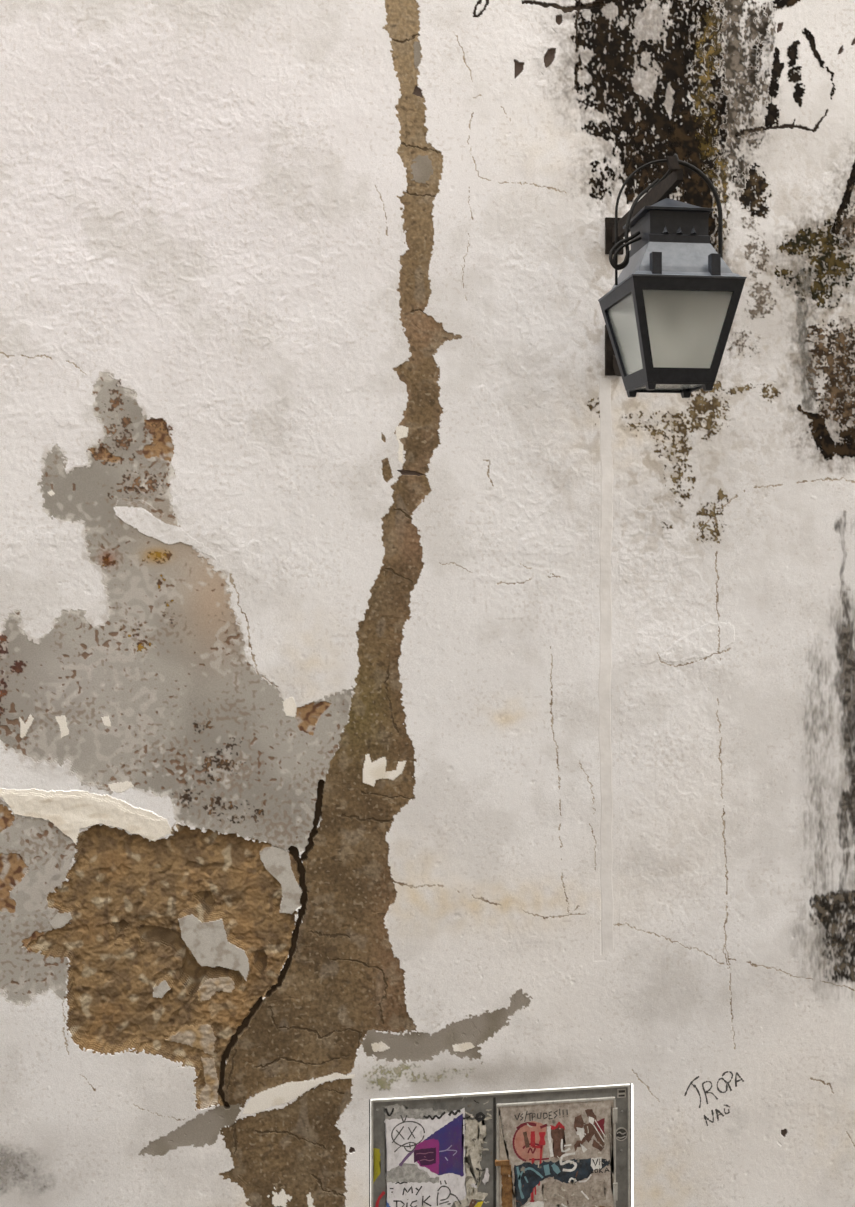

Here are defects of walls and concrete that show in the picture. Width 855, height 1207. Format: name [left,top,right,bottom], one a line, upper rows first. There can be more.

damp [571,0,836,357]
damp [831,163,855,247]
damp [622,381,781,507]
damp [797,318,855,461]
damp [693,489,728,543]
peeling [0,0,532,1207]
damp [837,567,855,861]
crack [217,779,325,1108]
damp [810,890,855,982]